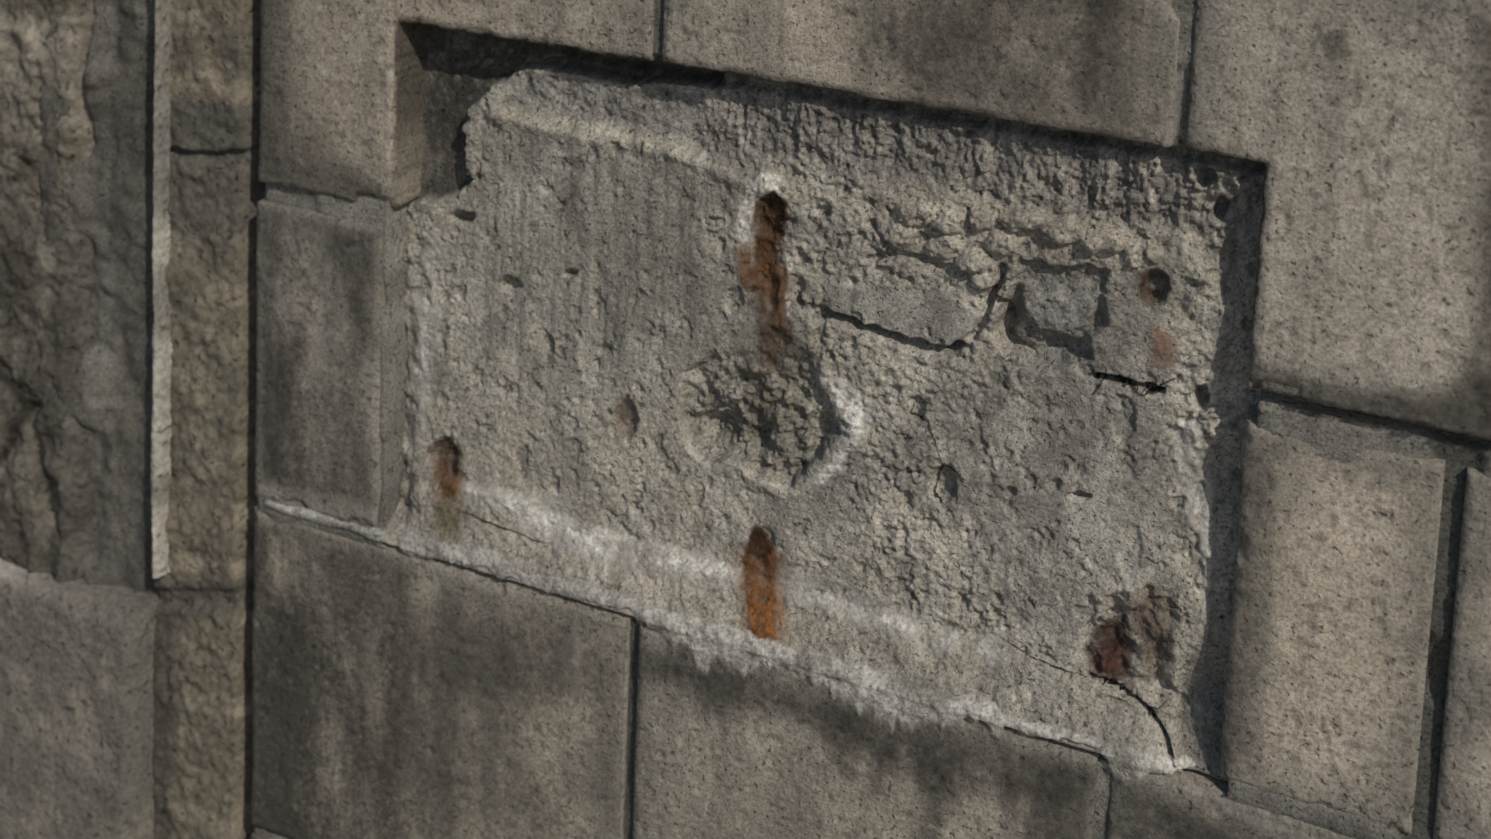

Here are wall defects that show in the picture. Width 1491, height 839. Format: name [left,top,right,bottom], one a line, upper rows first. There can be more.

spalling [409,26,726,206]
rust [738,192,790,356]
spalling [676,323,850,494]
leakage [804,375,872,486]
crack [910,402,963,503]
crack [1088,372,1180,396]
leakage [251,501,1228,839]
rust [742,526,783,641]
crack [1003,639,1174,758]
rust [1093,620,1130,679]
spalling [1077,580,1184,717]
leakage [1173,415,1214,629]